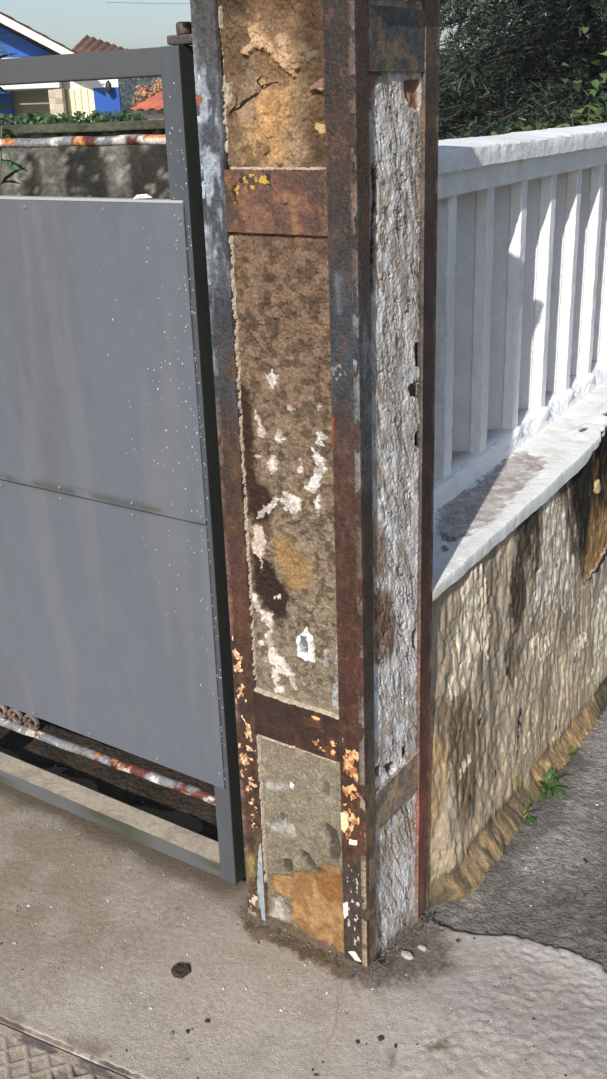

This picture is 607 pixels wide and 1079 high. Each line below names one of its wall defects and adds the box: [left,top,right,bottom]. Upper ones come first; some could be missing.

crack [228,75,277,116]
peeling [254,410,287,475]
peeling [266,369,279,390]
peeling [251,431,328,568]
peeling [437,451,547,551]
peeling [252,592,299,694]
corrosion [373,523,394,661]
peeling [446,563,491,708]
water stain [508,508,540,683]
peeling [526,426,607,792]
corrosion [312,738,359,840]
spalling [249,812,362,962]